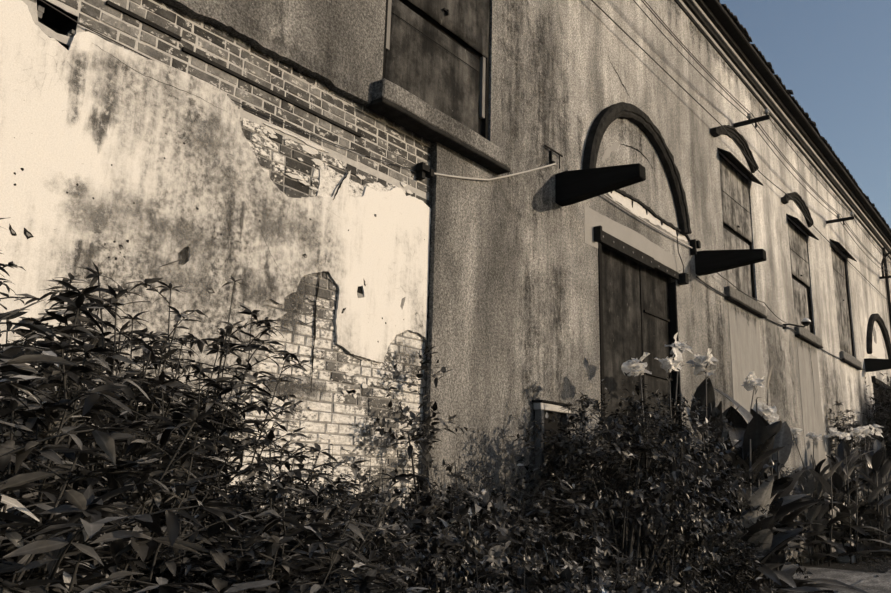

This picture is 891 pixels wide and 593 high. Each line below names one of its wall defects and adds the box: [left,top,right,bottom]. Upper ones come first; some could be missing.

water stain [72,59,84,119]
water stain [91,56,127,144]
spalling [22,0,430,218]
water stain [74,241,94,269]
water stain [73,186,113,227]
water stain [223,205,244,270]
water stain [242,200,320,334]
spalling [218,271,425,529]